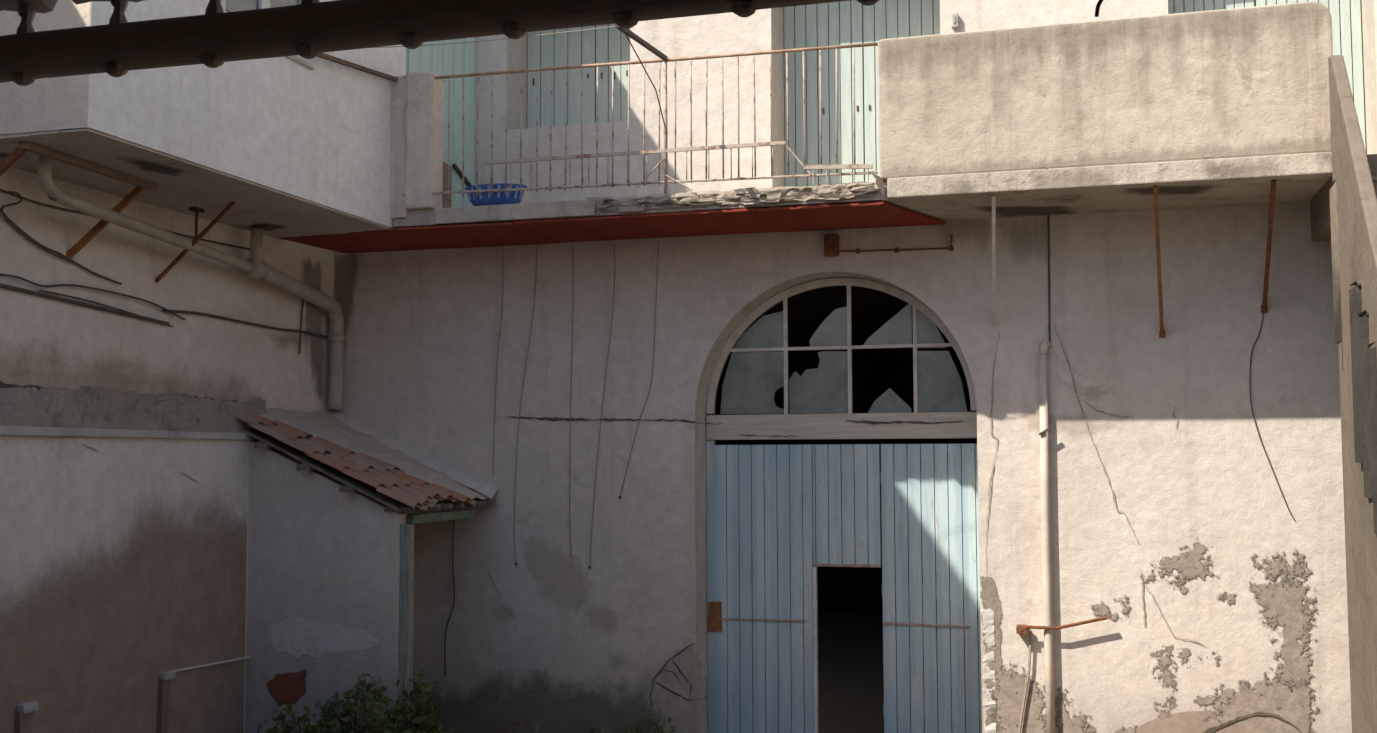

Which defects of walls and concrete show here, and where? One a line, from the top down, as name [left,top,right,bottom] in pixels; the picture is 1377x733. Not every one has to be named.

crack [985,332,1000,576]
crack [1052,320,1216,652]
peeling [266,669,307,706]
crack [649,643,709,710]
peeling [980,576,1096,733]
corrosion [1016,616,1108,733]
peeling [1091,595,1132,621]
peeling [1140,537,1321,733]